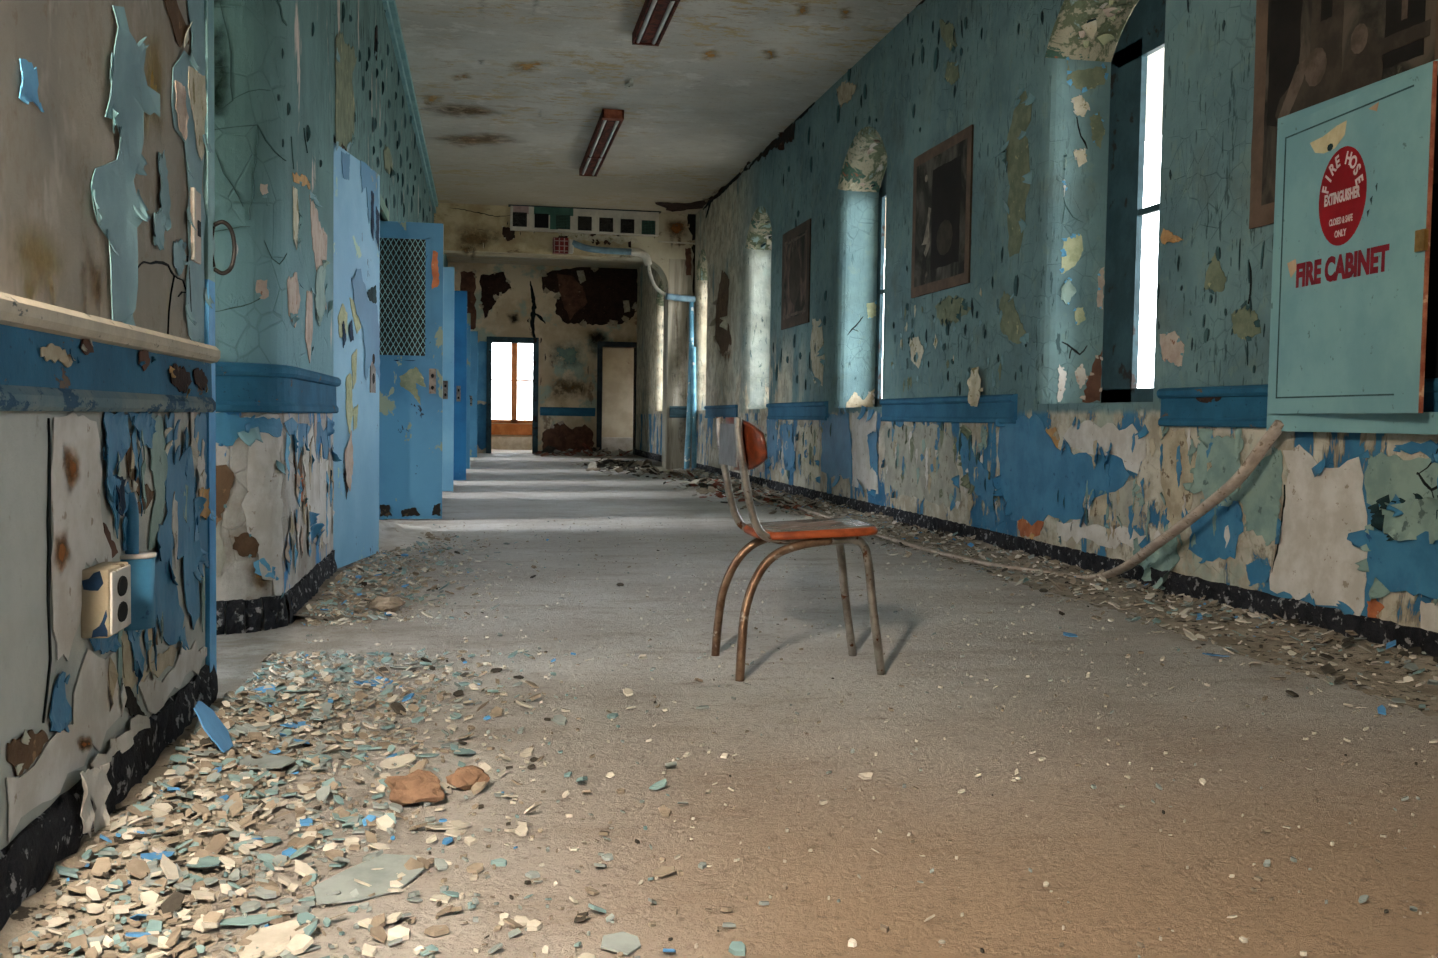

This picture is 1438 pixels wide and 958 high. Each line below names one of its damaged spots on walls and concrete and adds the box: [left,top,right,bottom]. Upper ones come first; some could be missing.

peeling [19,59,44,112]
peeling [90,0,214,343]
crack [214,0,308,265]
peeling [1062,57,1109,195]
flaking render [460,269,511,450]
flaking render [540,267,638,328]
peeling [773,290,827,390]
peeling [891,275,1029,407]
peeling [1059,234,1105,325]
peeling [1160,228,1183,291]
peeling [1158,238,1265,373]
flaking render [748,352,1438,633]